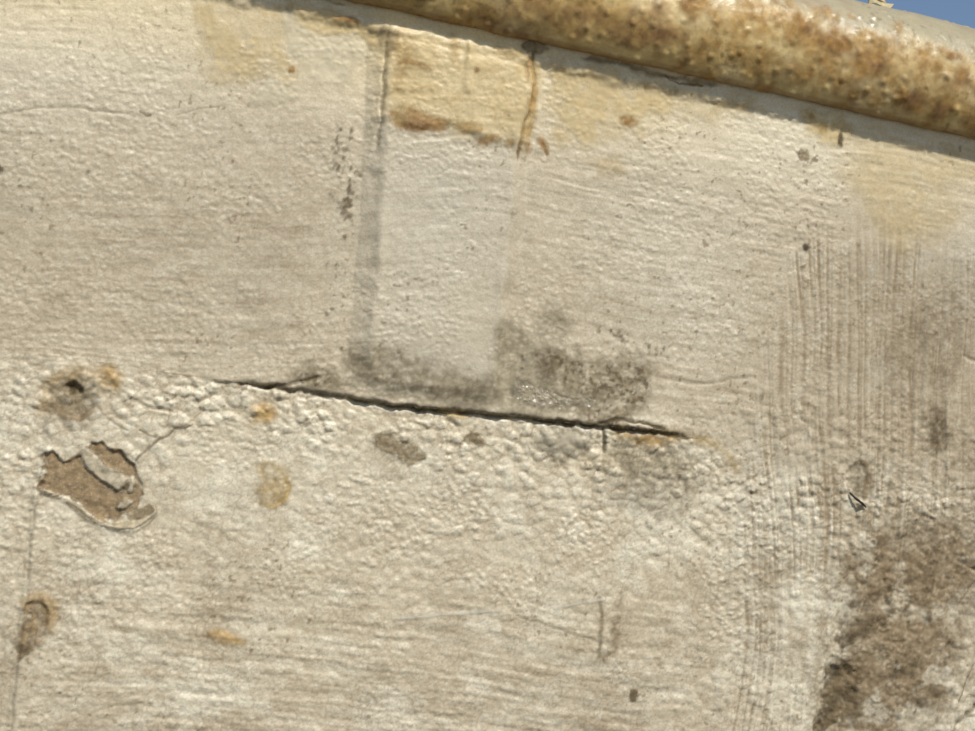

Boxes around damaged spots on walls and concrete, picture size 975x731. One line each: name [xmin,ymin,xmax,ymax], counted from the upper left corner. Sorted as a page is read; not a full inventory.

leakage [286,4,376,75]
leakage [335,128,361,220]
leakage [348,328,651,429]
crack [348,397,687,451]
spalling [37,442,156,532]